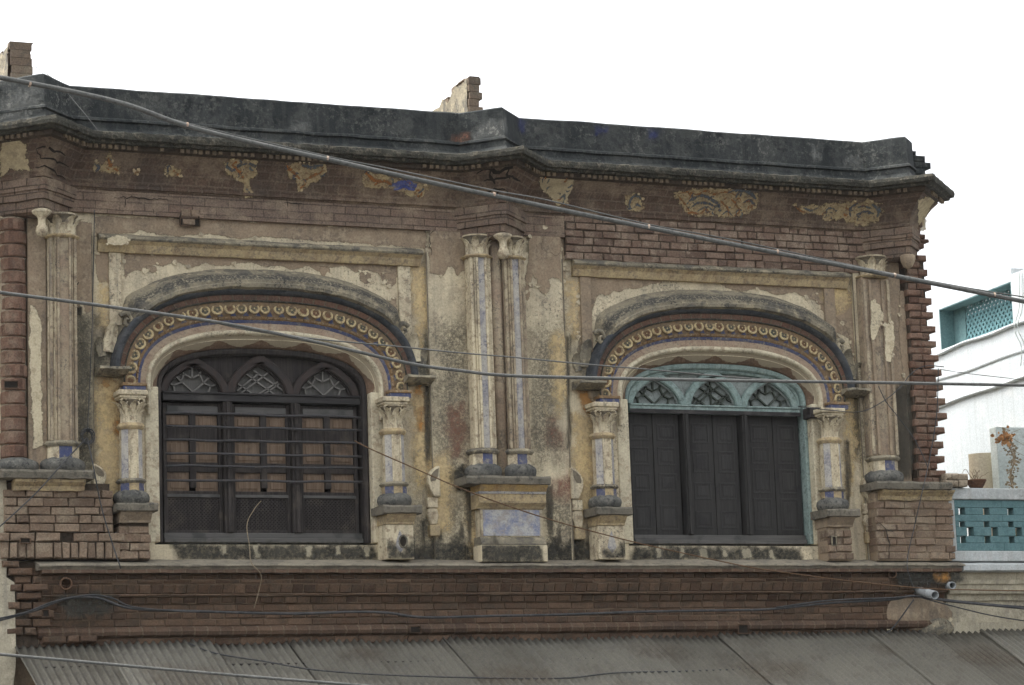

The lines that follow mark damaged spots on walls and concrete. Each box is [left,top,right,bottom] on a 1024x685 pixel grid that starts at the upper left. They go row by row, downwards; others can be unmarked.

crack [35,146,69,180]
crack [477,166,521,194]
peeling [94,216,466,307]
flaking render [525,193,866,354]
peeling [880,290,909,382]
damp [172,322,590,562]